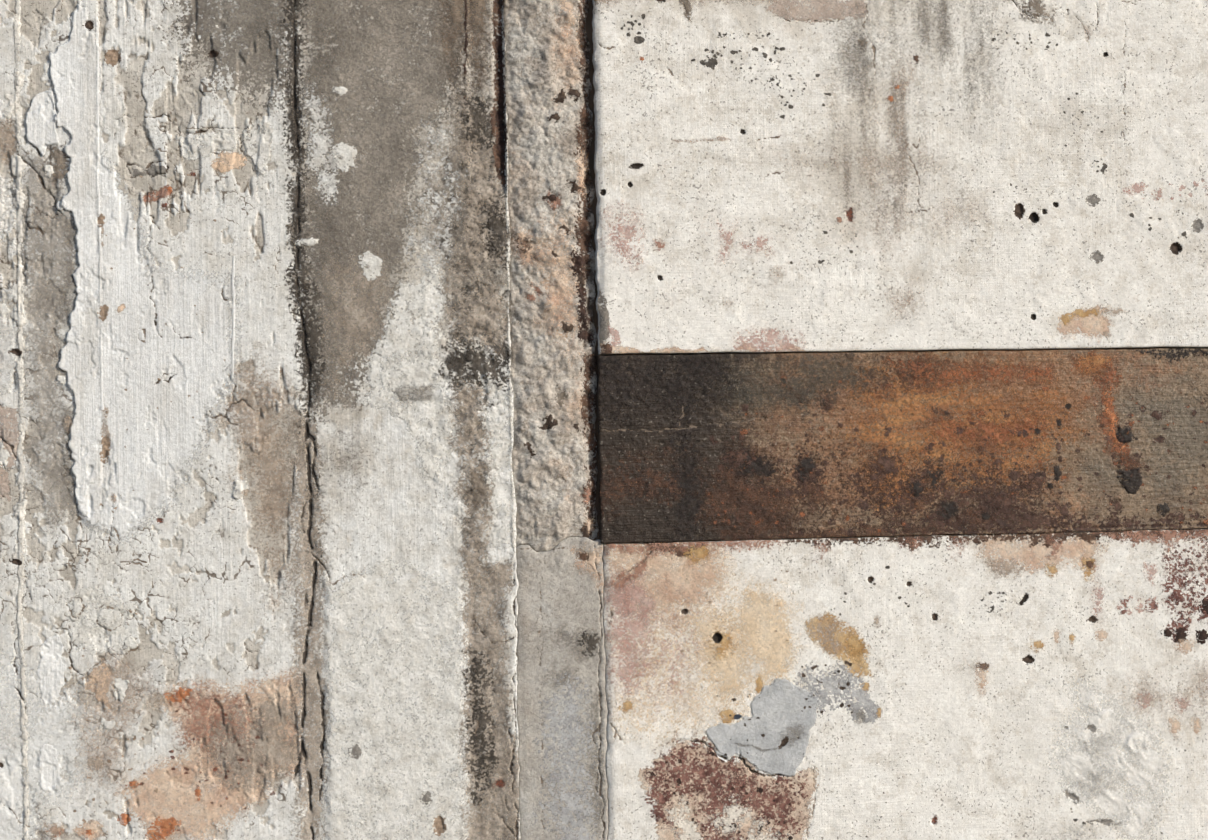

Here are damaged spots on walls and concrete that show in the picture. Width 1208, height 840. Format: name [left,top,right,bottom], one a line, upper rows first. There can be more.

spalling [158,0,358,205]
leakage [679,0,703,22]
leakage [843,38,868,83]
rust [1020,0,1056,26]
peeling [0,4,299,588]
peeling [295,237,319,248]
rust [516,0,705,536]
crack [292,0,375,840]
leakage [280,0,520,840]
rust [571,305,1208,733]
rust [68,650,309,840]
spalling [638,661,879,840]